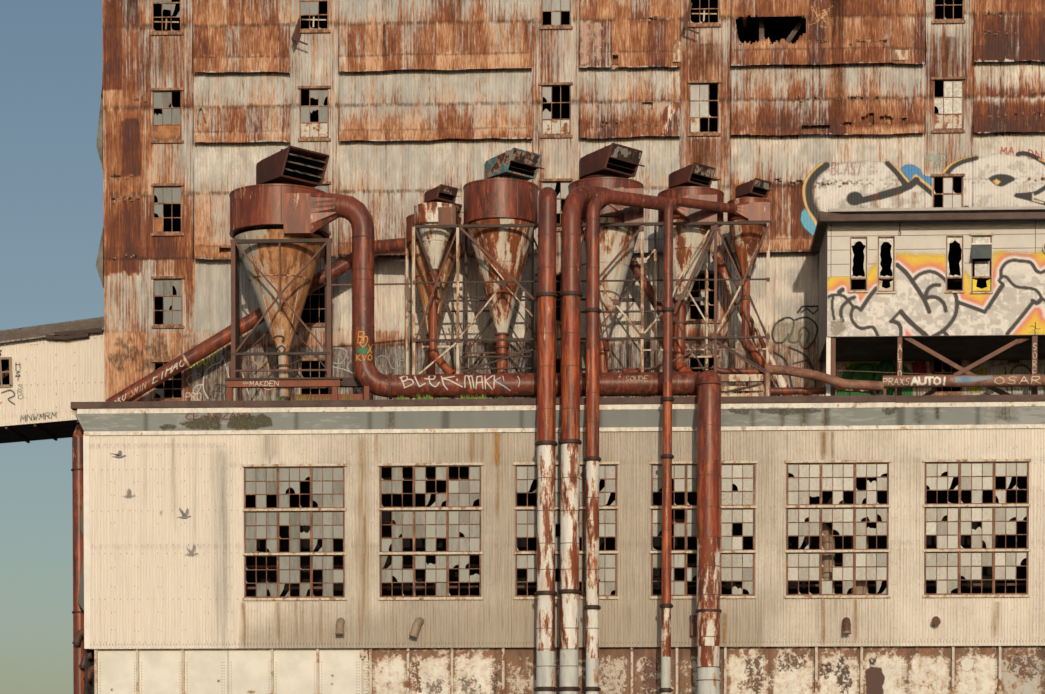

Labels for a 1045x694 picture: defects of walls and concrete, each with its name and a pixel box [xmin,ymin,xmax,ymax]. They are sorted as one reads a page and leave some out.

peeling [411,660,445,694]
peeling [458,673,497,694]
peeling [602,658,630,694]
peeling [643,656,658,694]
peeling [737,654,806,694]
peeling [820,656,853,693]
peeling [865,658,885,694]
peeling [961,657,974,672]
peeling [1004,654,1042,682]